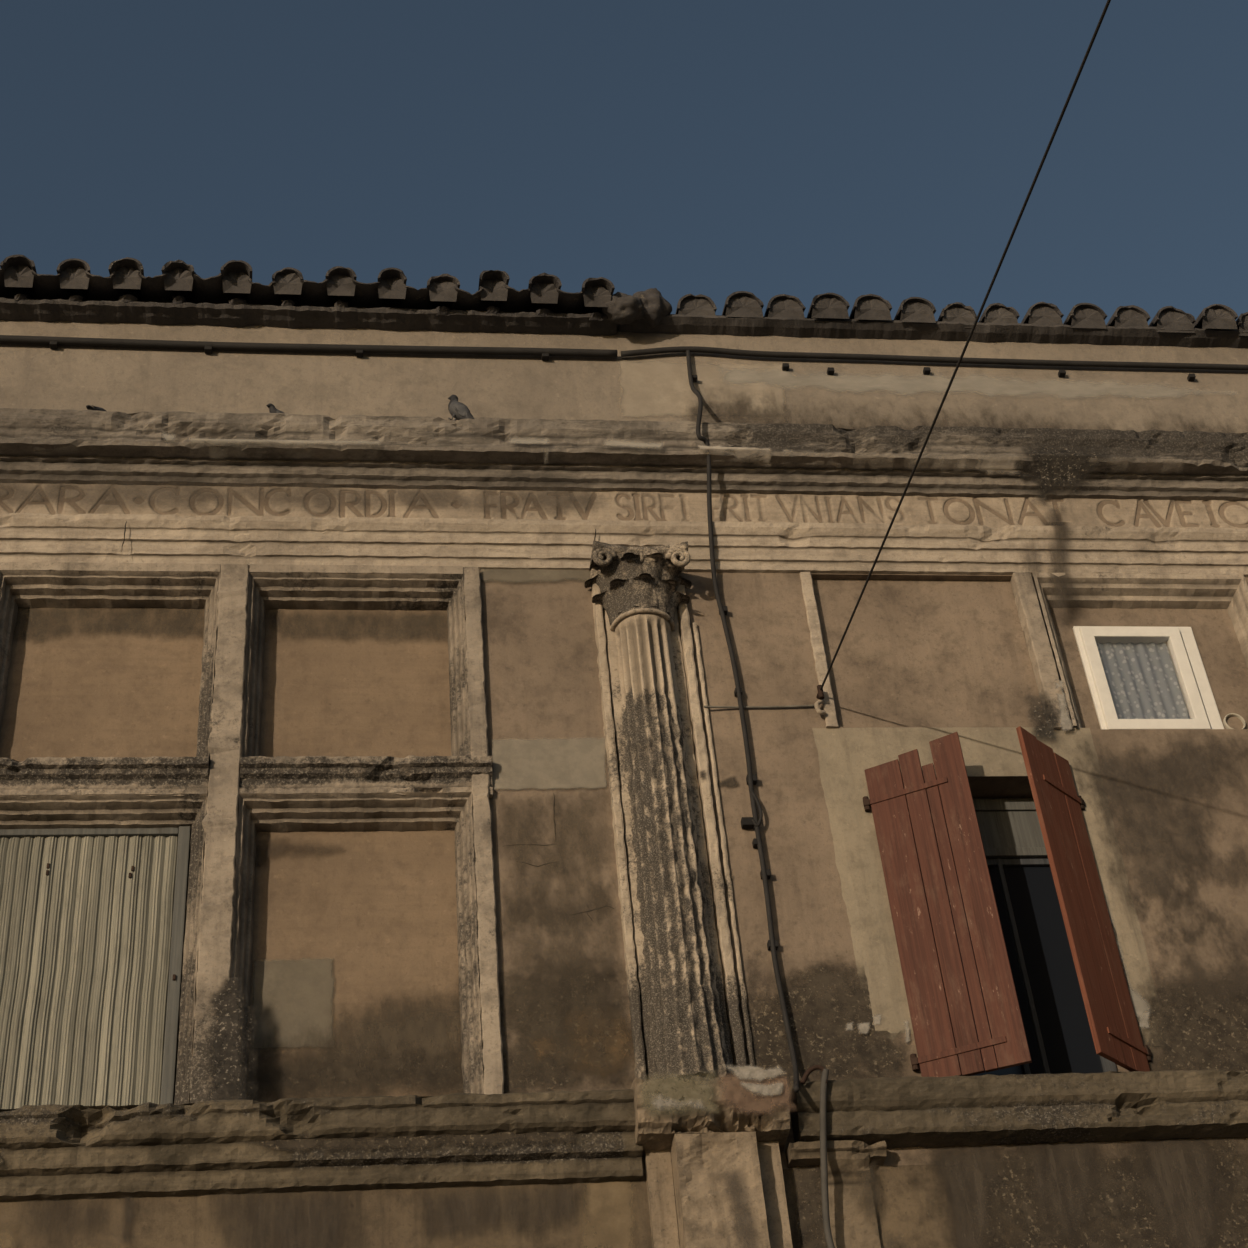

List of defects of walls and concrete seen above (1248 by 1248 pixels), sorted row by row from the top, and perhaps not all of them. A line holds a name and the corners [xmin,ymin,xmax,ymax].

water stain [691,401,804,424]
water stain [1087,741,1248,940]
water stain [247,997,463,1101]
water stain [724,963,905,1086]
water stain [1137,925,1248,1073]